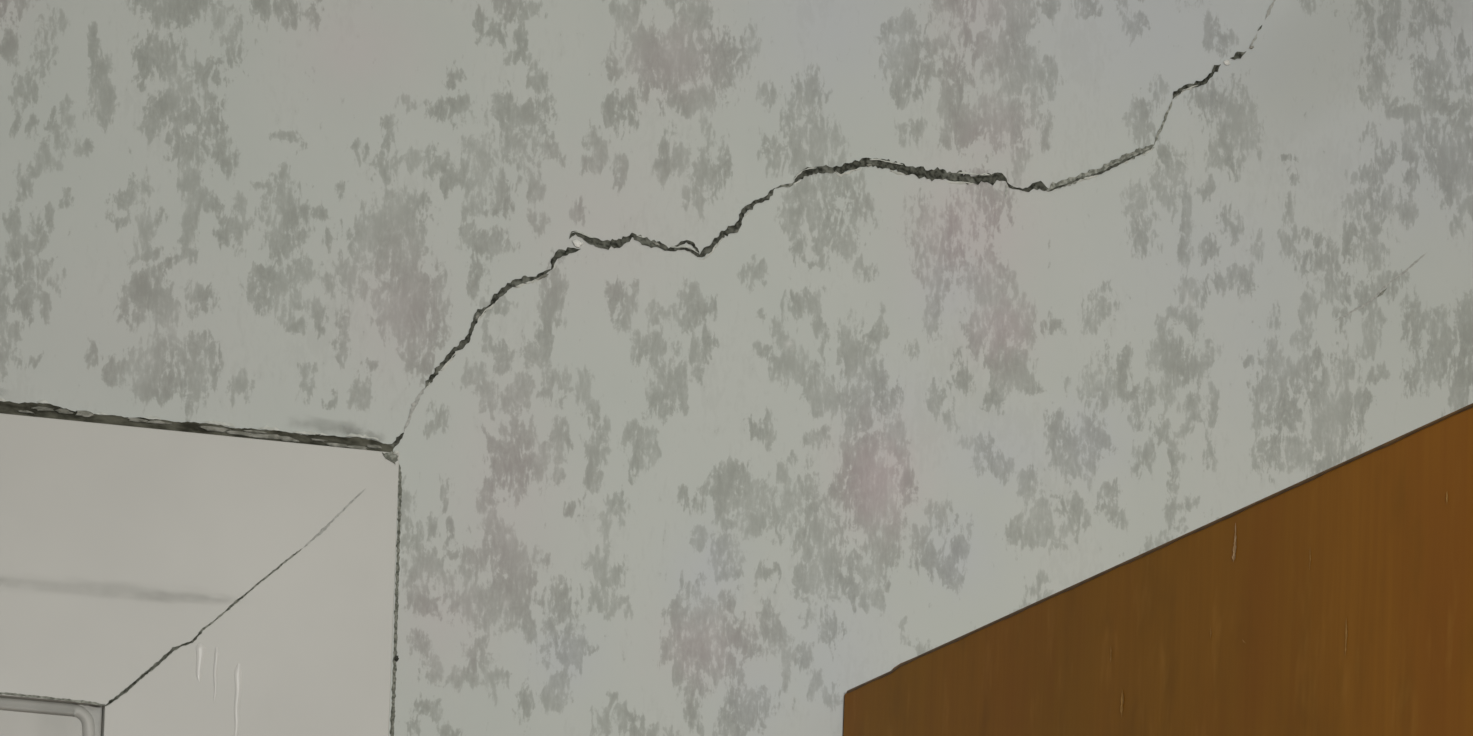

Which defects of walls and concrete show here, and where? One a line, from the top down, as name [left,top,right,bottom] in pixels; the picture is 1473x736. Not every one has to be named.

crack [0,489,365,706]
crack [388,0,1276,736]